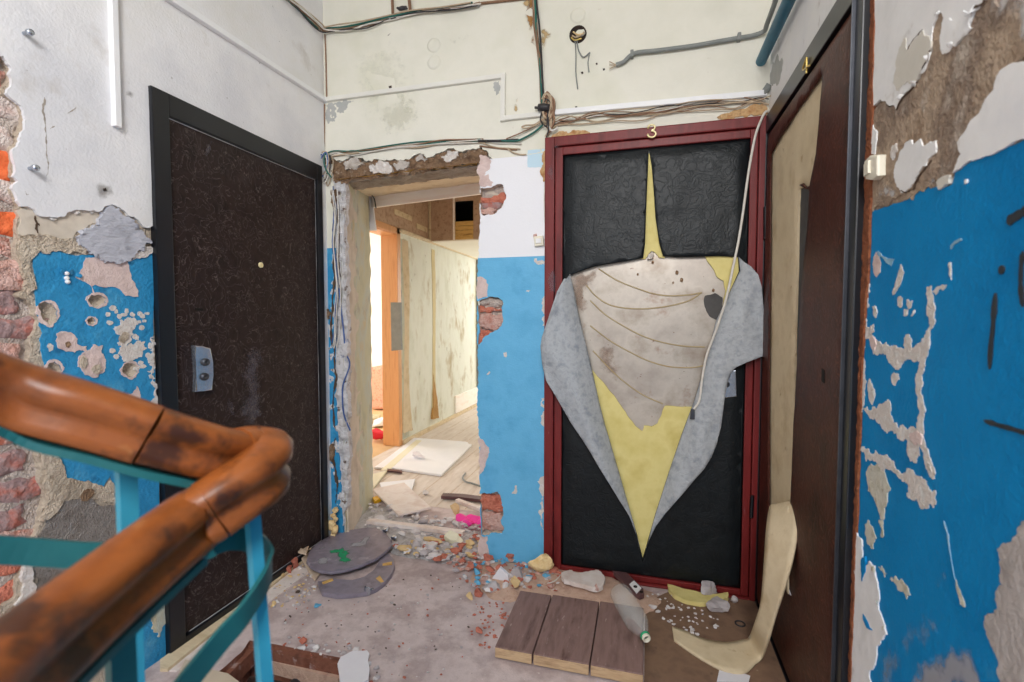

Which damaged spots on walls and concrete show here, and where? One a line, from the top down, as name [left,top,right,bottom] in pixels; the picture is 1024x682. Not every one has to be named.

spalling [871,0,1024,212]
flaking render [0,63,158,404]
spalling [326,148,506,526]
flaking render [0,565,67,606]
flaking render [0,438,116,542]
spalling [478,485,517,560]
peeling [851,251,952,682]
spalling [983,521,1024,682]